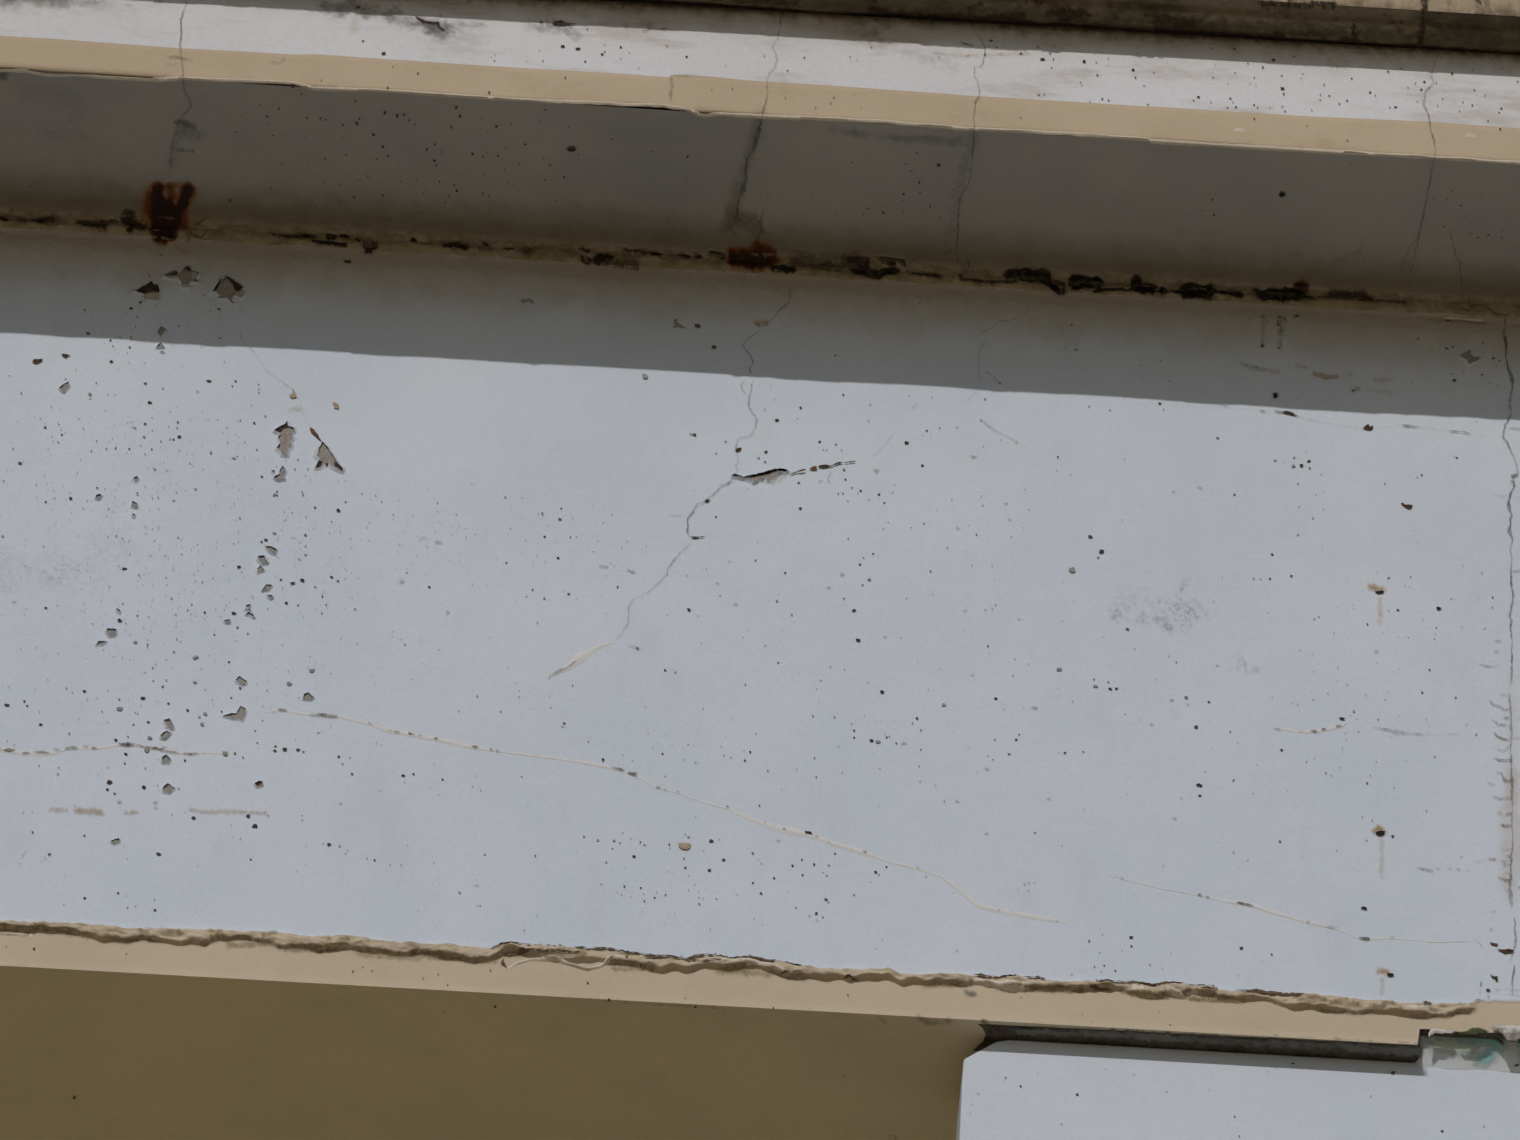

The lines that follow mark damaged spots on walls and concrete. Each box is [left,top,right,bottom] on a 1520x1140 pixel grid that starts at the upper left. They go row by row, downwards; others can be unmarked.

water stain [609,0,1520,55]
rust [127,182,204,245]
rust [726,239,780,271]
crack [686,448,742,538]
peeling [0,254,454,819]
crack [0,742,230,756]
peeling [219,780,269,860]
crack [263,708,1065,923]
flaking render [0,923,48,949]
flaking render [423,929,802,986]
peeling [957,934,1453,1074]
flaking render [1492,1025,1520,1041]